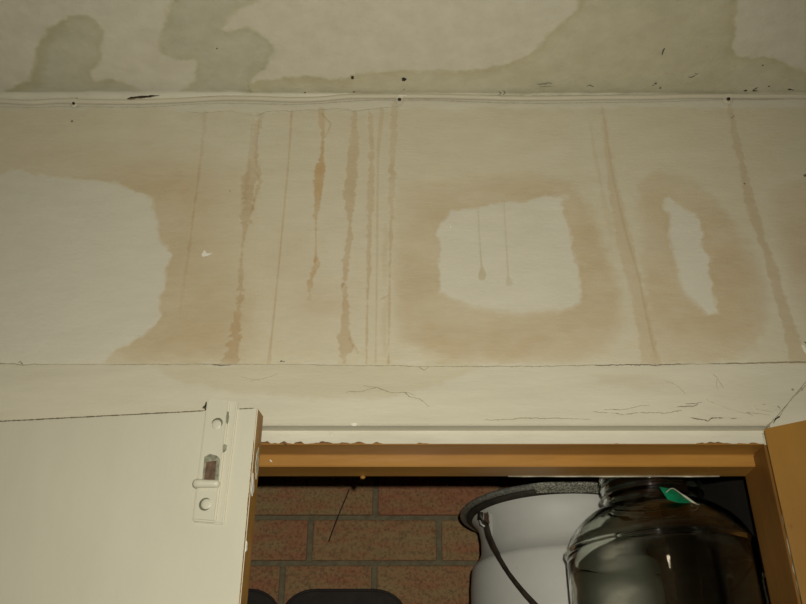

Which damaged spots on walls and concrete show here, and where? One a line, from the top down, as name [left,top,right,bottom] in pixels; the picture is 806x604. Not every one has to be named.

crack [2,361,806,428]